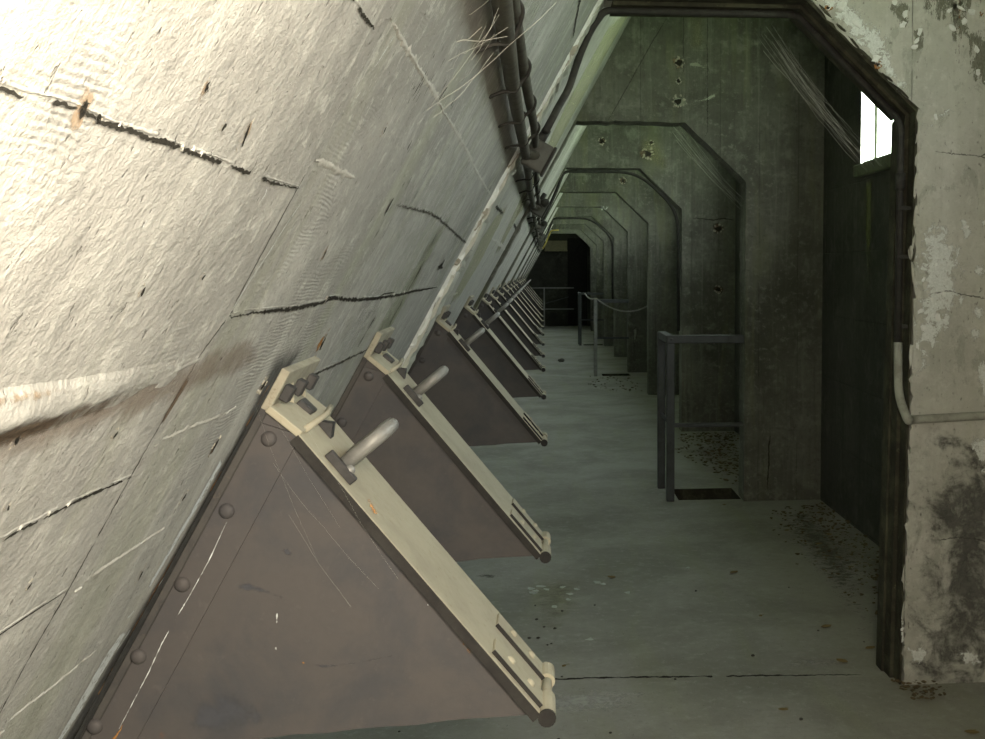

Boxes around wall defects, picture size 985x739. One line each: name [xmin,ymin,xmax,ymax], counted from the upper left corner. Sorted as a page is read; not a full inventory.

crack [353,0,375,30]
spalling [527,0,603,136]
peeling [925,0,985,84]
crack [0,78,298,189]
spalling [815,0,924,324]
crack [230,260,445,319]
spalling [402,147,521,366]
spalling [908,340,916,386]
crack [0,474,132,540]
crack [0,588,68,635]
spalling [901,557,909,621]
damp [900,436,985,683]